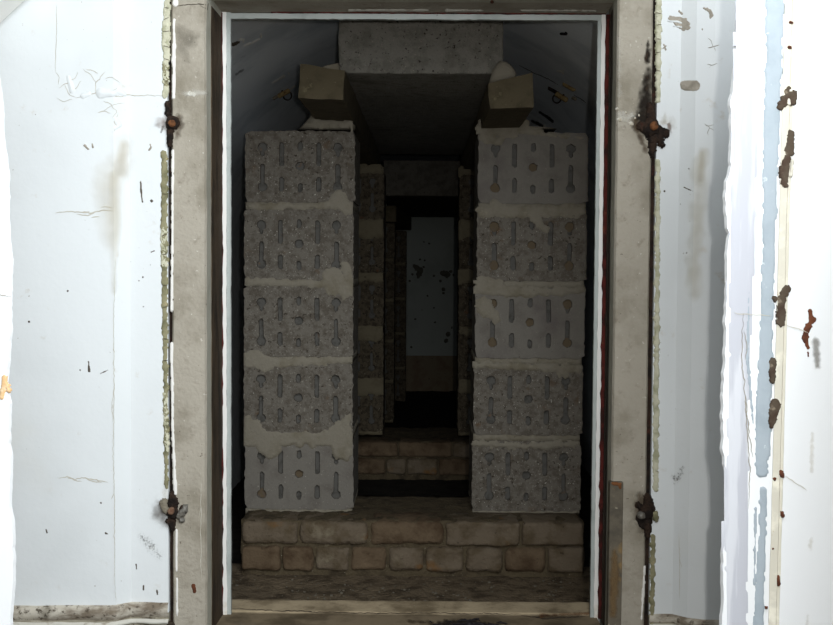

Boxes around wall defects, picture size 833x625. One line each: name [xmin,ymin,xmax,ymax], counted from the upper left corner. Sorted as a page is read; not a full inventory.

crack [55,6,160,132]
peeling [721,0,785,625]
rust [801,309,819,367]